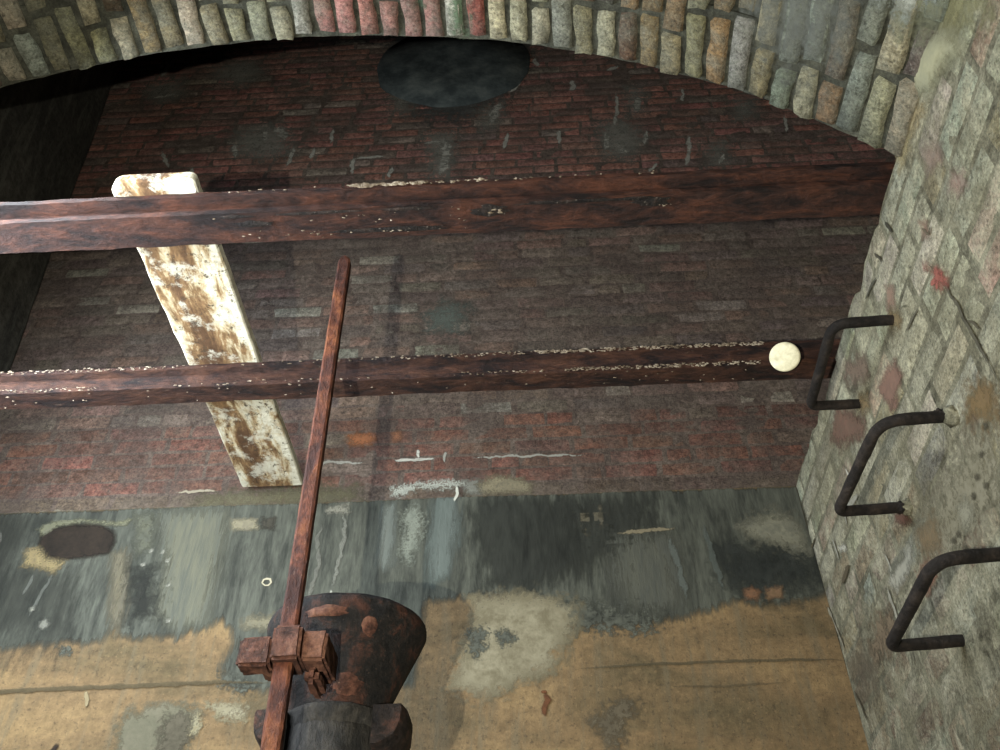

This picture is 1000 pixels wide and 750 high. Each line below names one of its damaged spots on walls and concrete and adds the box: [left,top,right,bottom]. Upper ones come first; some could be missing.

corrosion [346,177,497,188]
corrosion [0,363,212,375]
corrosion [435,341,764,357]
corrosion [565,360,761,381]
damp [106,485,302,642]
damp [308,531,321,595]
damp [318,483,362,593]
damp [378,474,533,586]
damp [602,526,696,623]
damp [733,505,813,556]
corrosion [306,604,348,617]
corrosion [361,616,378,637]